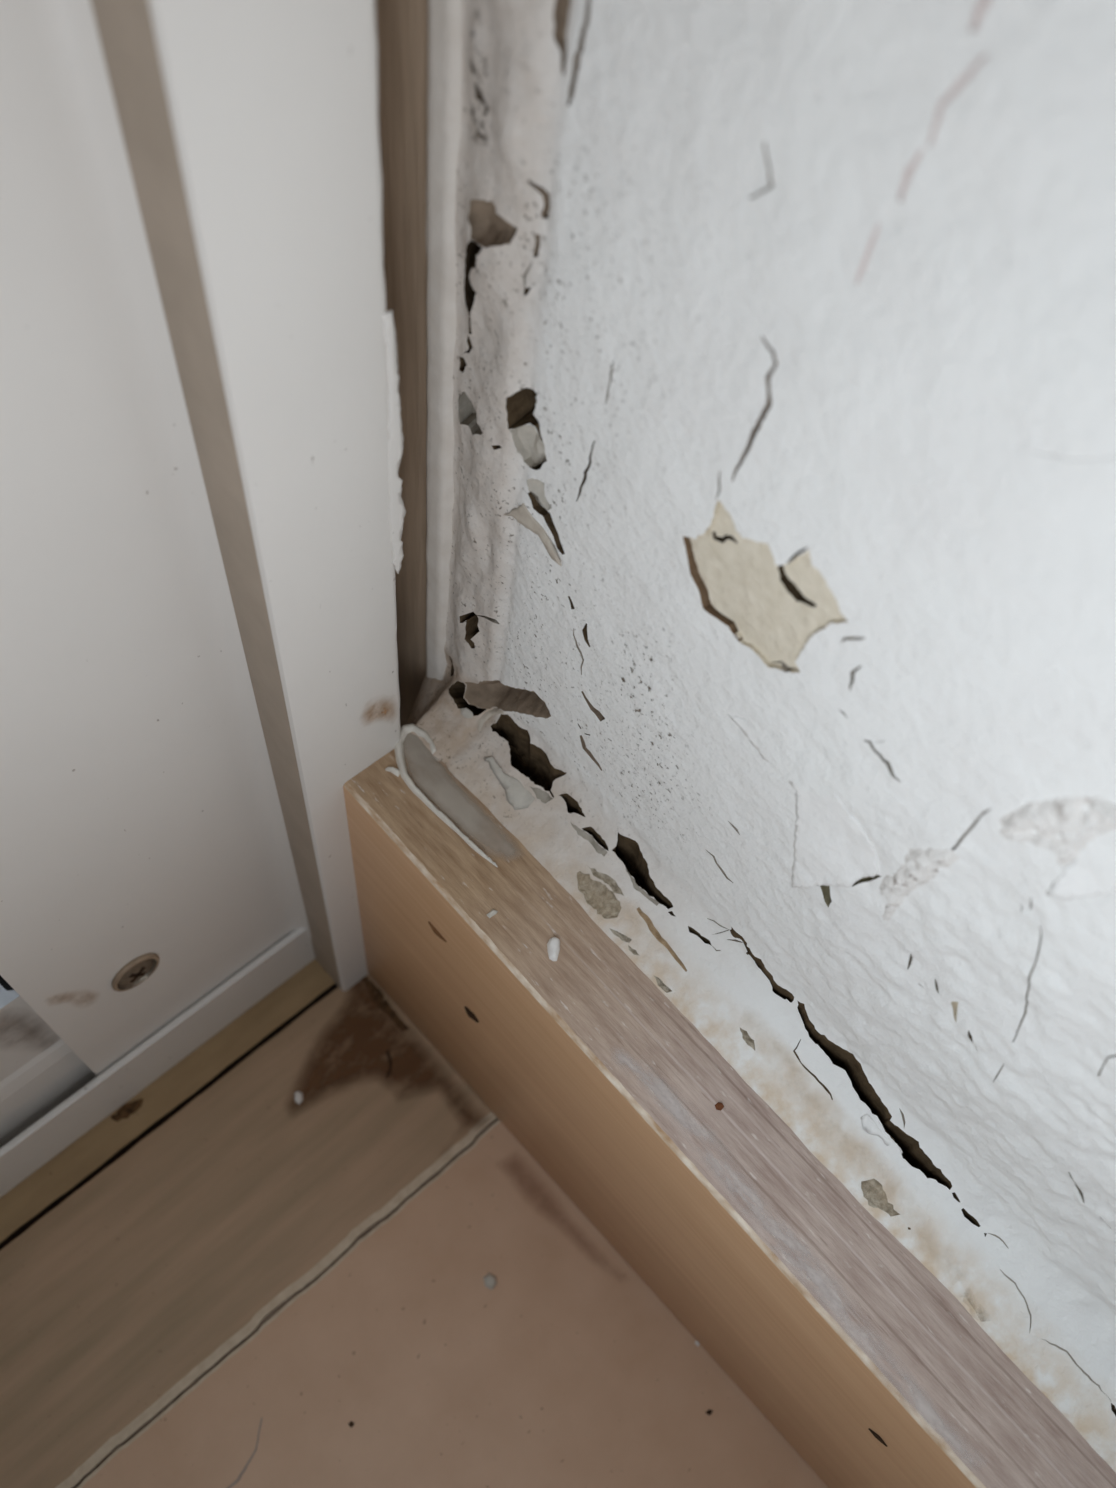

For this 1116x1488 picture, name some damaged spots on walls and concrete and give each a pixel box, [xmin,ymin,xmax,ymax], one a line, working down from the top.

crack [855,0,991,284]
flaking render [459,199,518,372]
flaking render [458,387,565,566]
crack [716,337,778,498]
peeling [683,500,848,673]
flaking render [448,656,551,731]
crack [568,596,605,771]
crack [705,849,733,883]
crack [951,809,991,851]
flaking render [1000,796,1116,866]
leakage [293,980,477,1123]
crack [707,900,1116,1416]